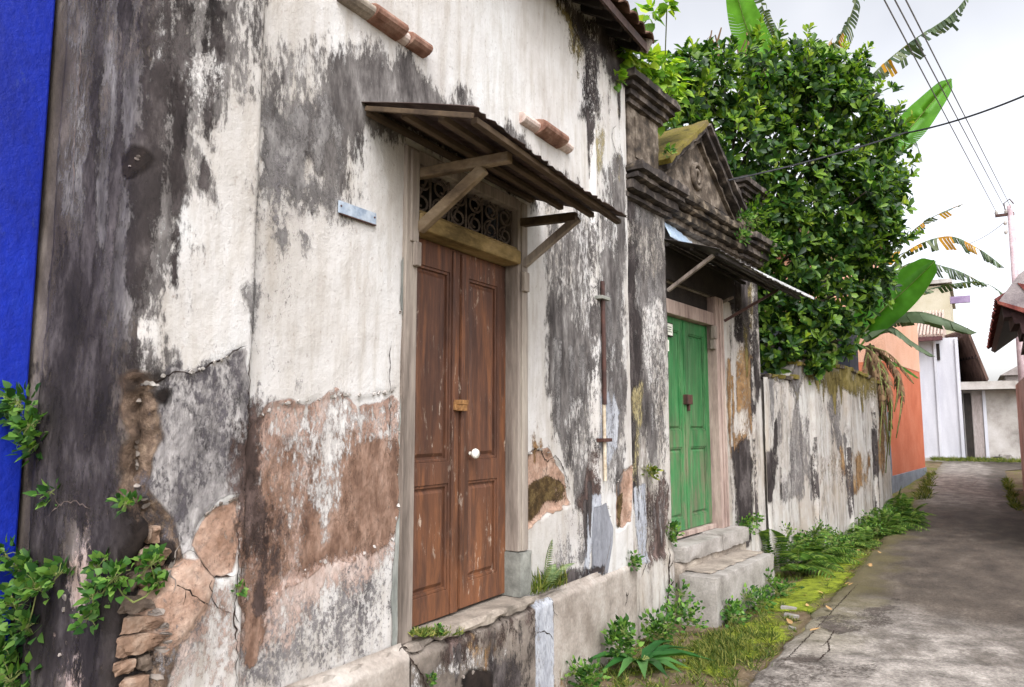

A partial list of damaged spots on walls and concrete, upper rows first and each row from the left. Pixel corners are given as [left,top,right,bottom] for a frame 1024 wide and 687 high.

damp [498,117,533,153]
crack [139,346,251,686]
damp [10,0,474,687]
peeling [100,349,400,687]
spalling [461,667,493,687]
spalling [528,448,571,530]
damp [544,0,671,587]
damp [729,279,890,548]
crack [781,584,858,664]